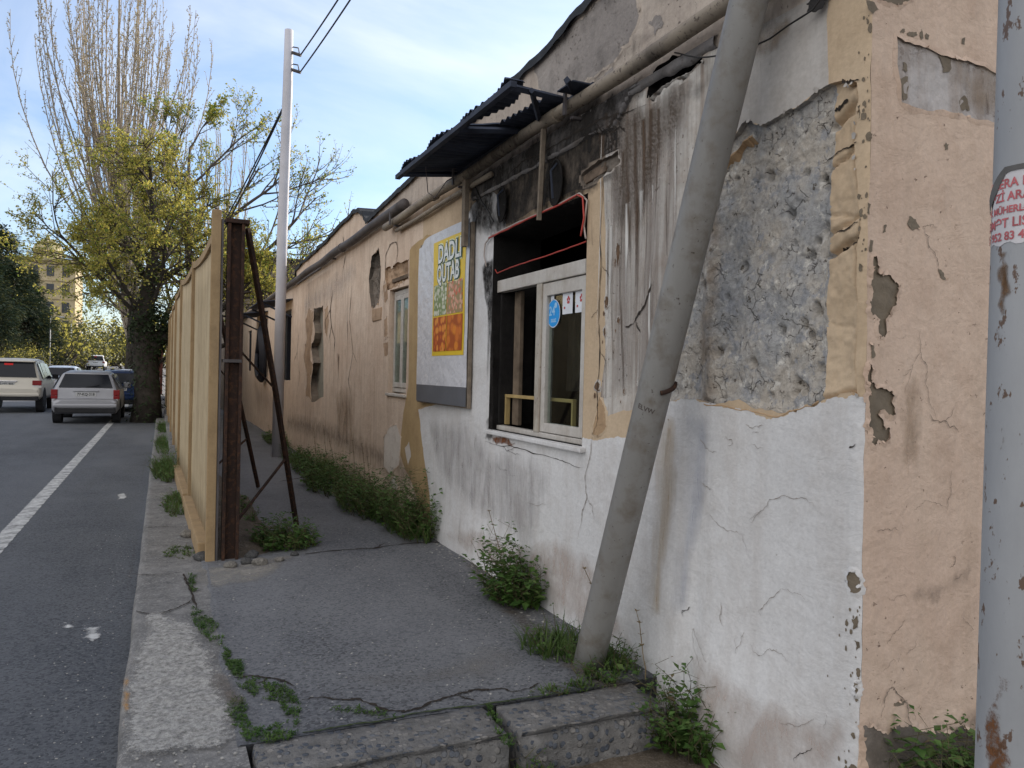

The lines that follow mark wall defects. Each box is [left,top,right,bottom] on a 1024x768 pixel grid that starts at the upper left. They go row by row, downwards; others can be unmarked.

peeling [892,29,996,126]
spalling [369,248,409,356]
damp [598,178,612,300]
damp [616,104,676,367]
flaking render [670,77,903,452]
peeling [907,216,921,230]
crack [473,191,610,539]
crack [306,542,438,554]
crack [719,590,801,656]
peeling [833,567,866,705]
crack [234,675,576,733]
corrosion [985,704,1010,768]